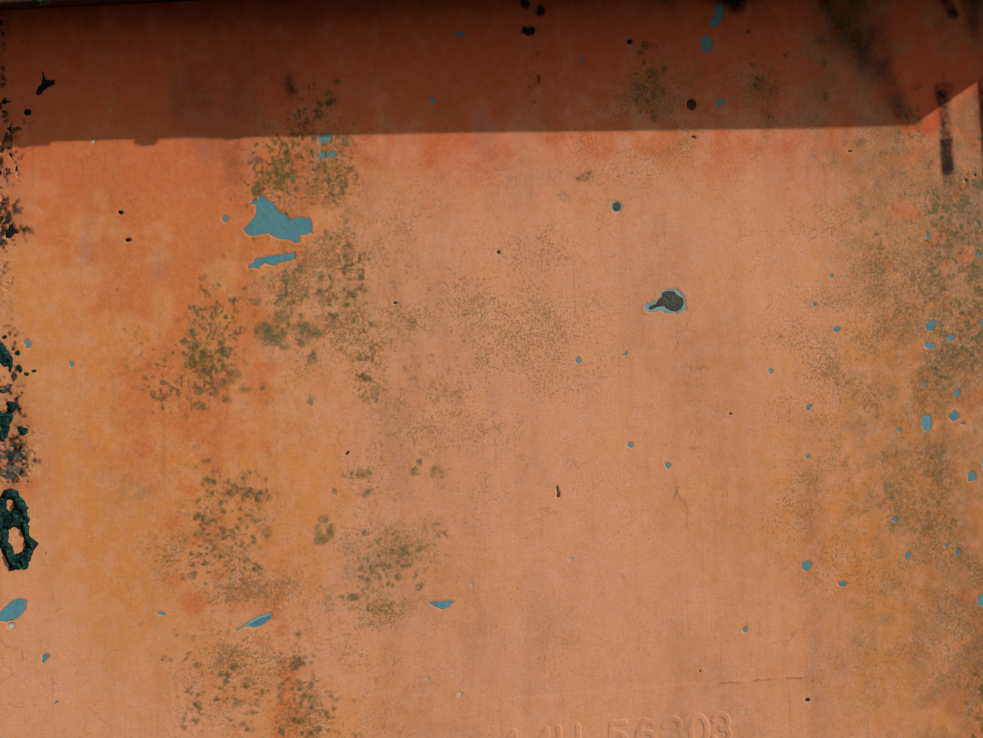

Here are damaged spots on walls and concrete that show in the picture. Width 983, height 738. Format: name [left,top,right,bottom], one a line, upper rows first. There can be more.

rust [936,86,953,174]
peeling [243,195,312,269]
spalling [645,289,686,315]
peeling [0,332,36,483]